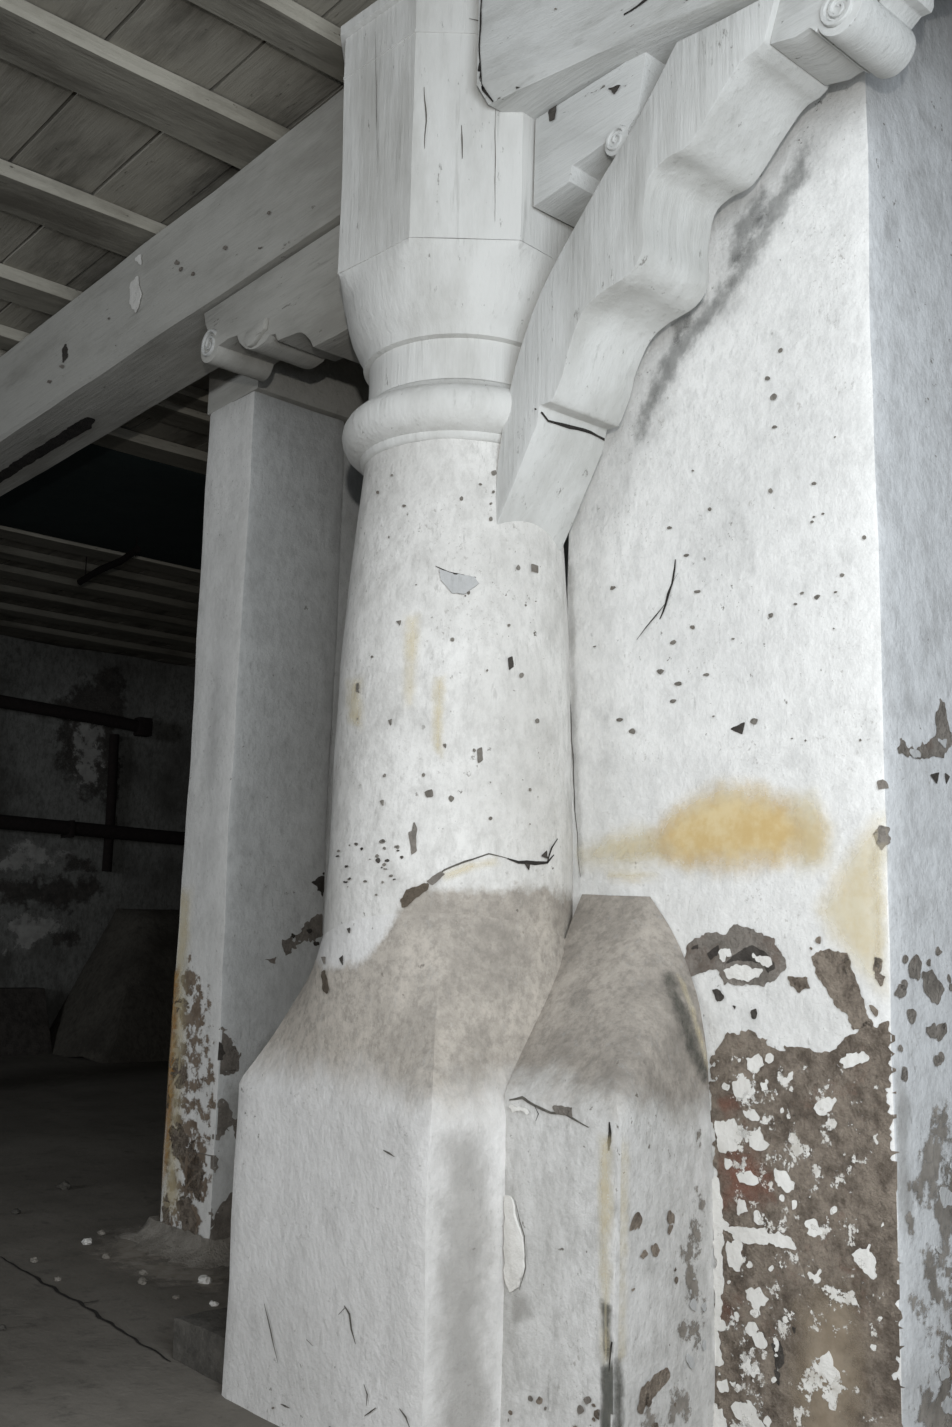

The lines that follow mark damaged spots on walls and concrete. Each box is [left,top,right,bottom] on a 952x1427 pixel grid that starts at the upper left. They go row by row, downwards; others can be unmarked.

crack [624,0,647,15]
crack [535,408,605,441]
crack [637,559,677,639]
leakage [55,667,126,826]
flaking render [898,698,952,784]
leakage [602,792,820,863]
peeling [873,825,891,850]
flaking render [265,914,343,994]
flaking render [218,1026,241,1076]
leakage [667,976,707,1079]
peeling [162,1098,237,1241]
flaking render [637,924,952,1427]